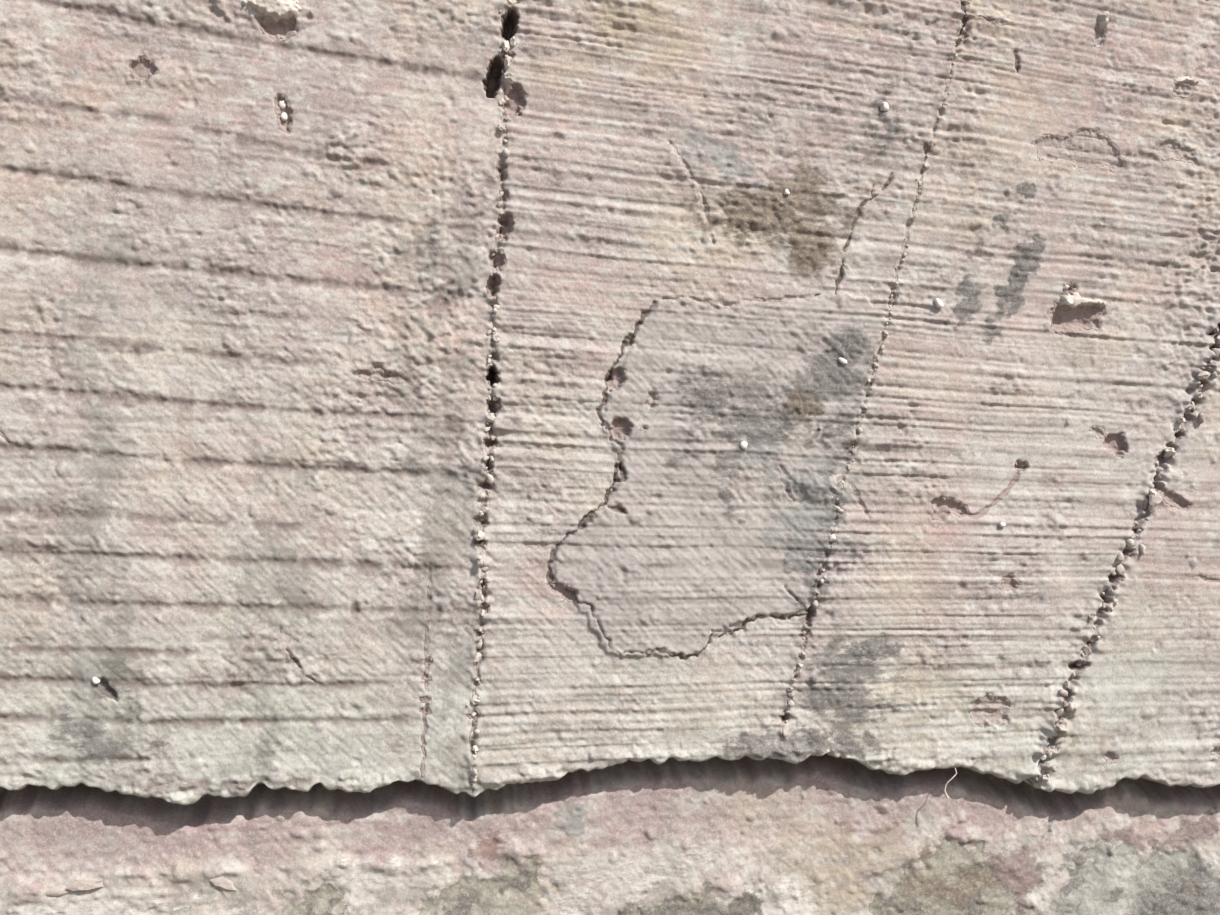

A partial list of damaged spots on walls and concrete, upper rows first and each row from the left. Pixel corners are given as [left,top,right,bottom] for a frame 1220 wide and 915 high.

crack [547,0,1020,744]